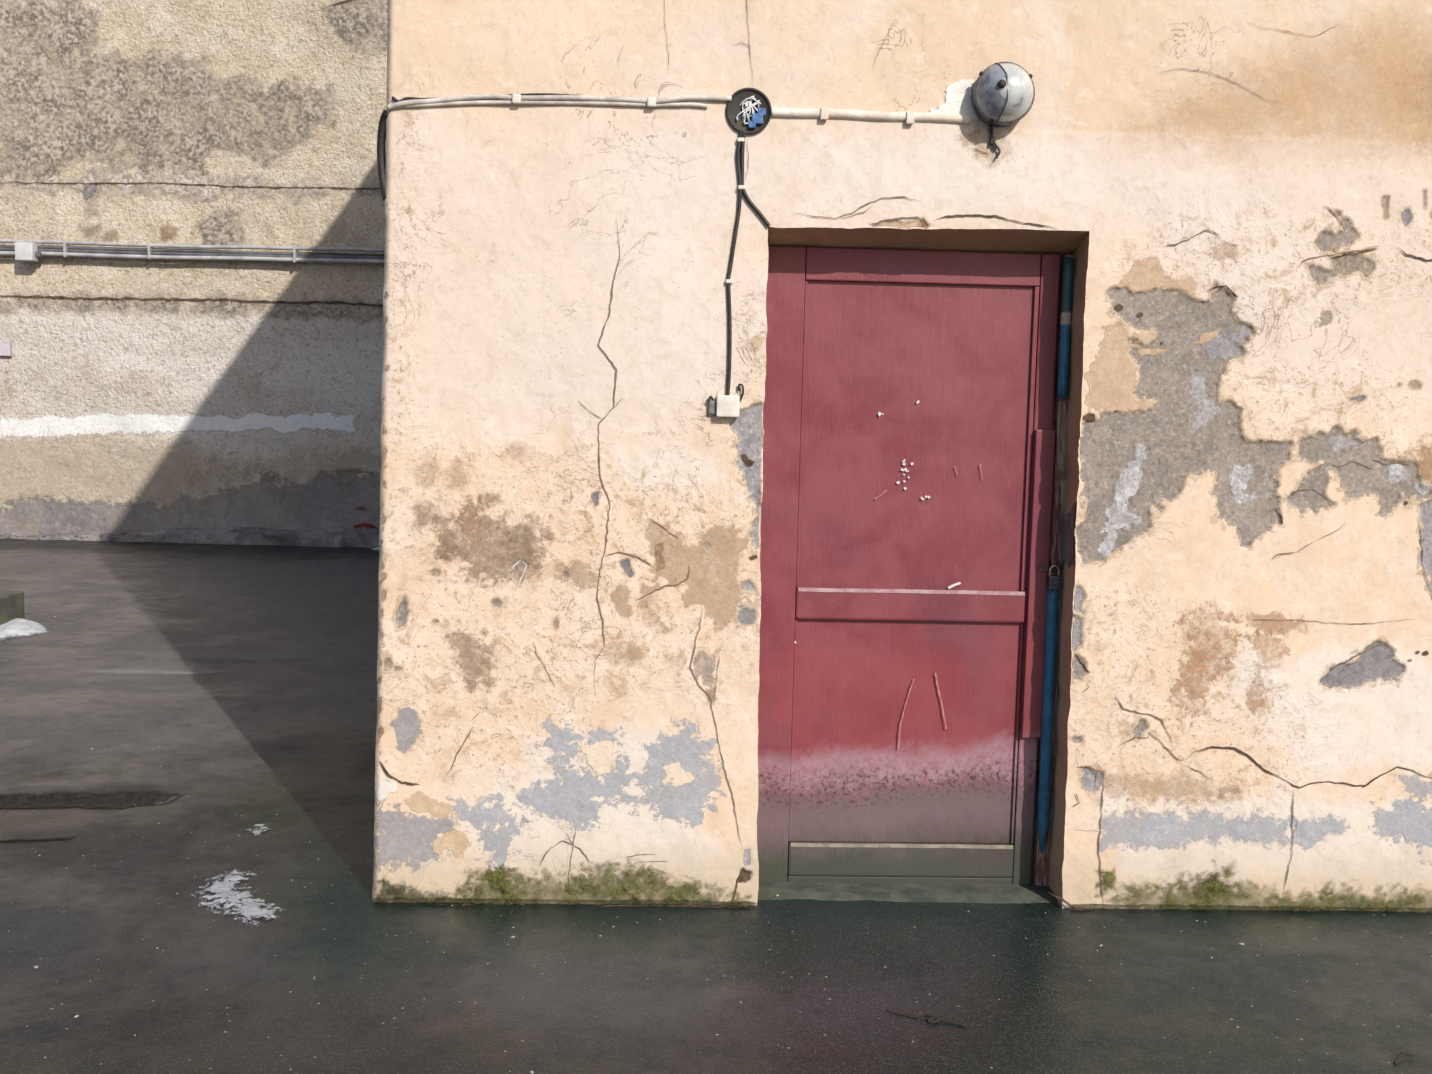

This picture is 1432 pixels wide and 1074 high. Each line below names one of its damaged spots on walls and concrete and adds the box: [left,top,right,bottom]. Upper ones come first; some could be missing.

crack [800,196,1057,229]
spalling [1304,207,1378,297]
crack [578,220,652,696]
spalling [729,400,763,560]
spalling [1060,257,1432,600]
spalling [1072,585,1090,692]
spalling [1319,636,1429,692]
crack [690,615,742,843]
peeling [405,790,533,869]
crack [540,830,589,882]
crack [606,880,747,908]
crack [1048,696,1431,911]